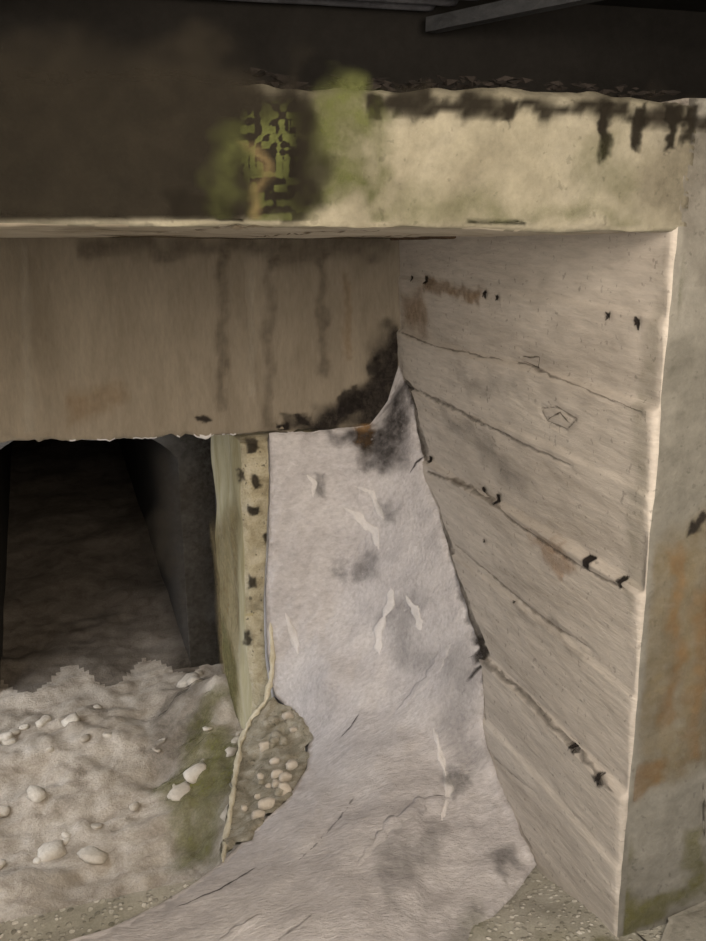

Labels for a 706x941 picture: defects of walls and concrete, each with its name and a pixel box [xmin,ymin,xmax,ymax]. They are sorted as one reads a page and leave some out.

damp [0,22,326,221]
damp [368,84,706,160]
spalling [277,414,309,430]
spalling [219,623,313,863]